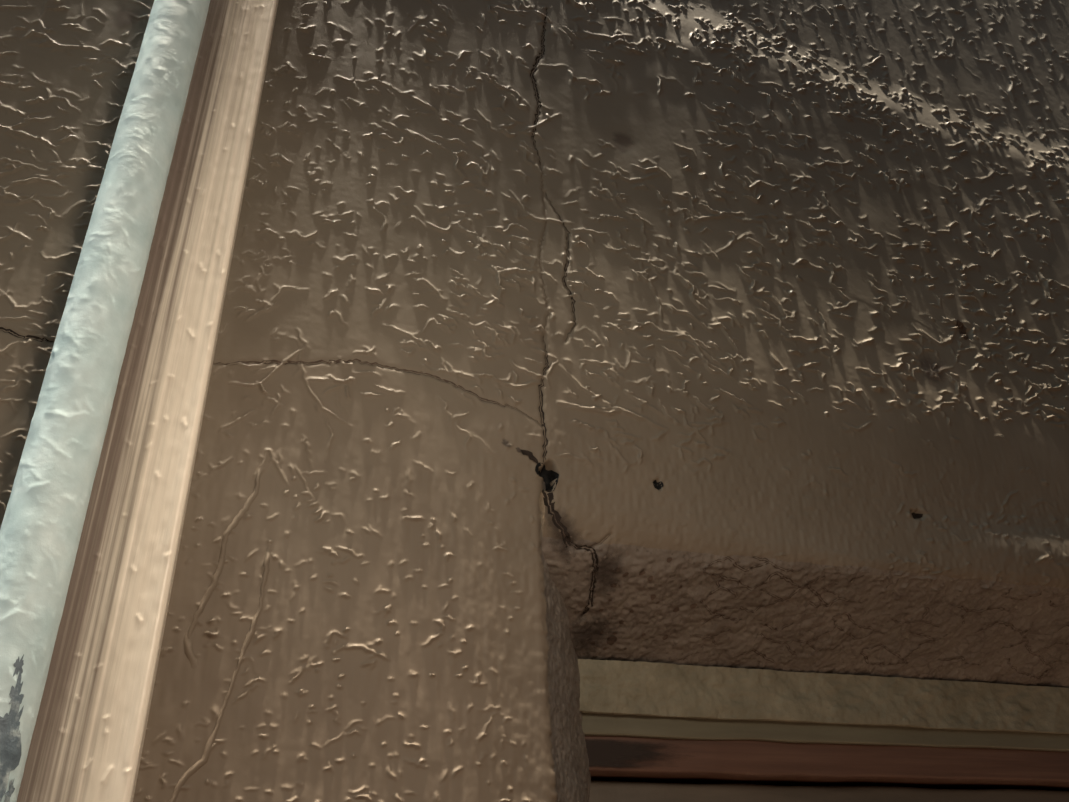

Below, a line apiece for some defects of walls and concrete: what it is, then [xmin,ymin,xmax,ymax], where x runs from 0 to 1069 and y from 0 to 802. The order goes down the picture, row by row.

crack [213,8,576,462]
crack [0,327,54,342]
crack [542,490,611,620]
crack [680,556,1069,679]